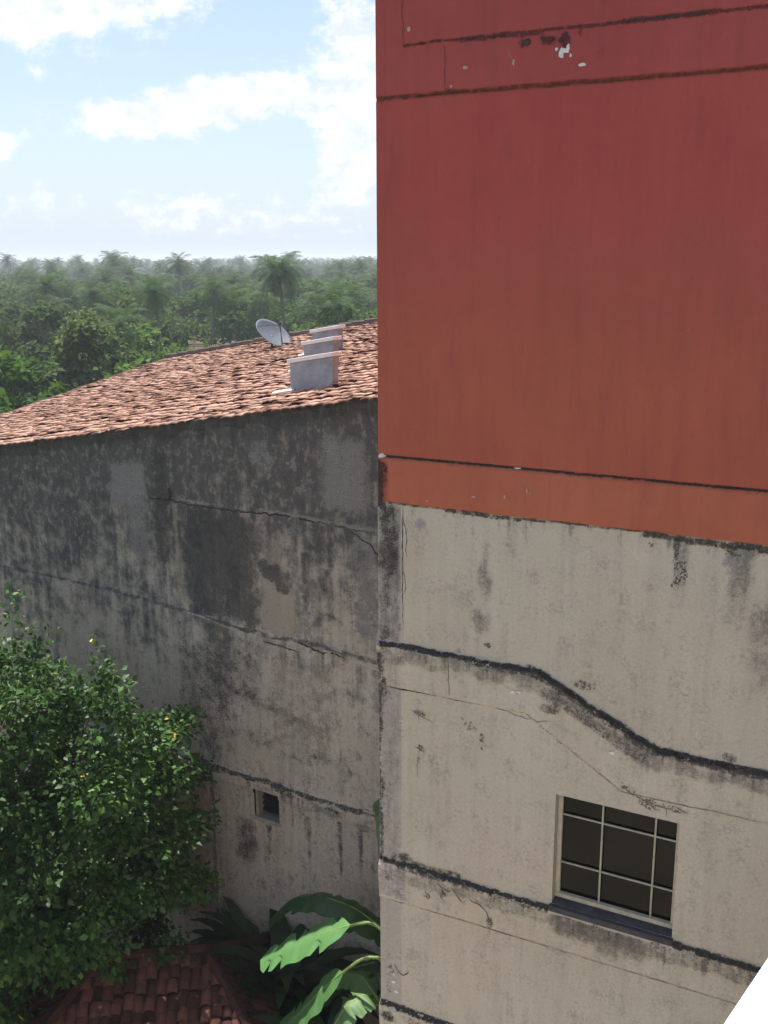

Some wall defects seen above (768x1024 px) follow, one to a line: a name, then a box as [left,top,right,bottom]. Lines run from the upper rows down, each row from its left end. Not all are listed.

peeling [518,30,586,67]
crack [107,487,408,617]
damp [0,398,768,985]
crack [388,663,767,823]
crack [396,883,737,1005]